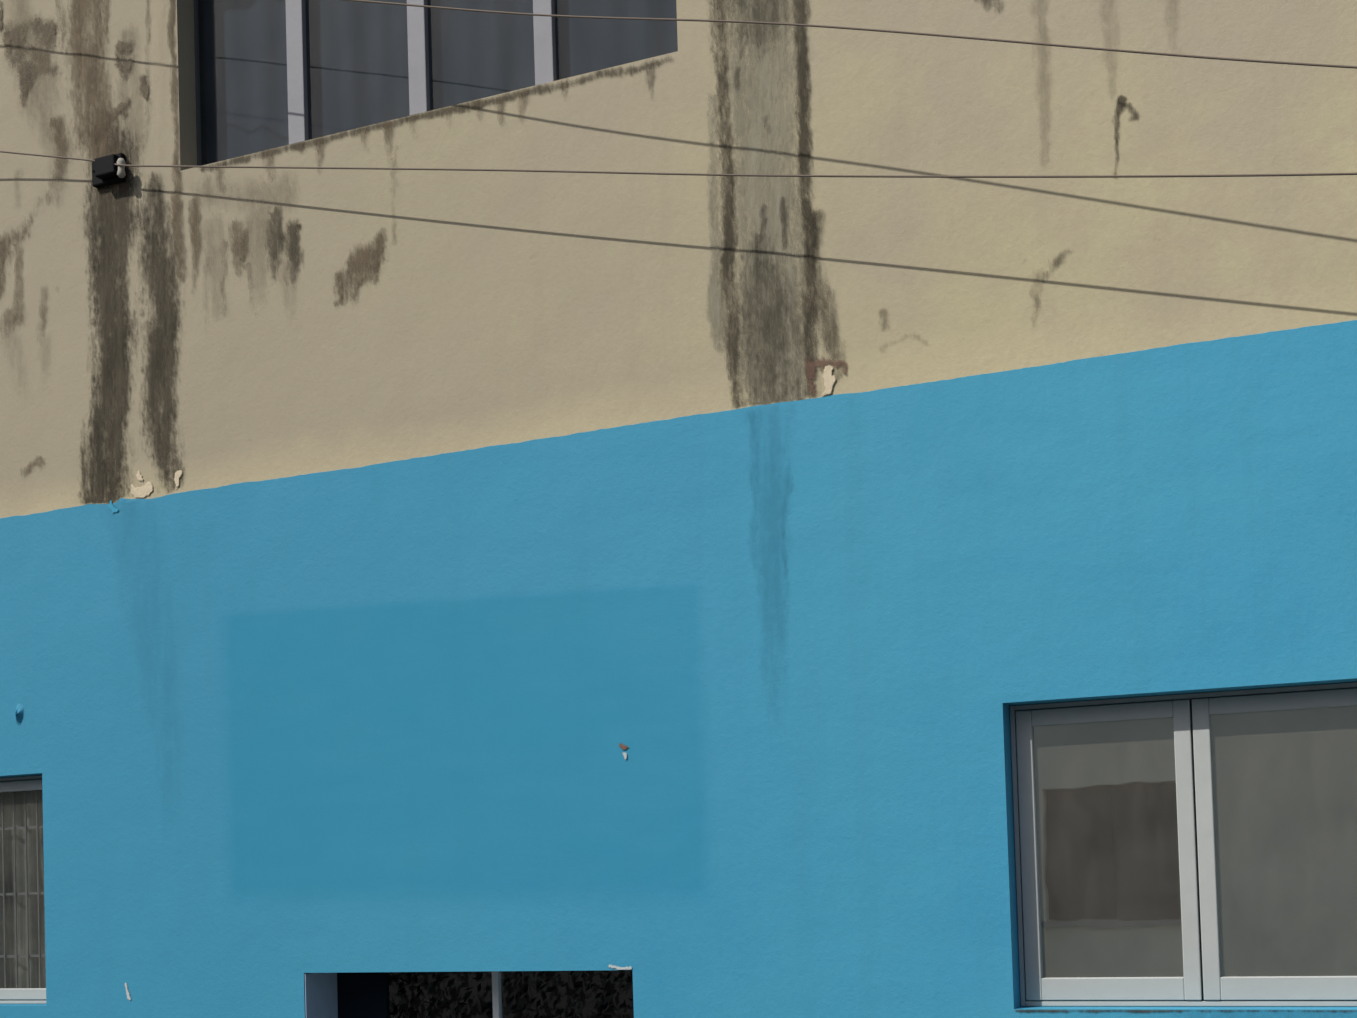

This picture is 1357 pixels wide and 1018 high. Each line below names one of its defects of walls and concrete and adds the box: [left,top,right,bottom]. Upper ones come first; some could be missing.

leakage [201,61,660,180]
leakage [0,215,32,323]
leakage [62,0,201,504]
leakage [266,207,302,280]
leakage [335,232,385,304]
leakage [708,0,838,407]
peeling [805,359,847,396]
peeling [131,470,153,498]